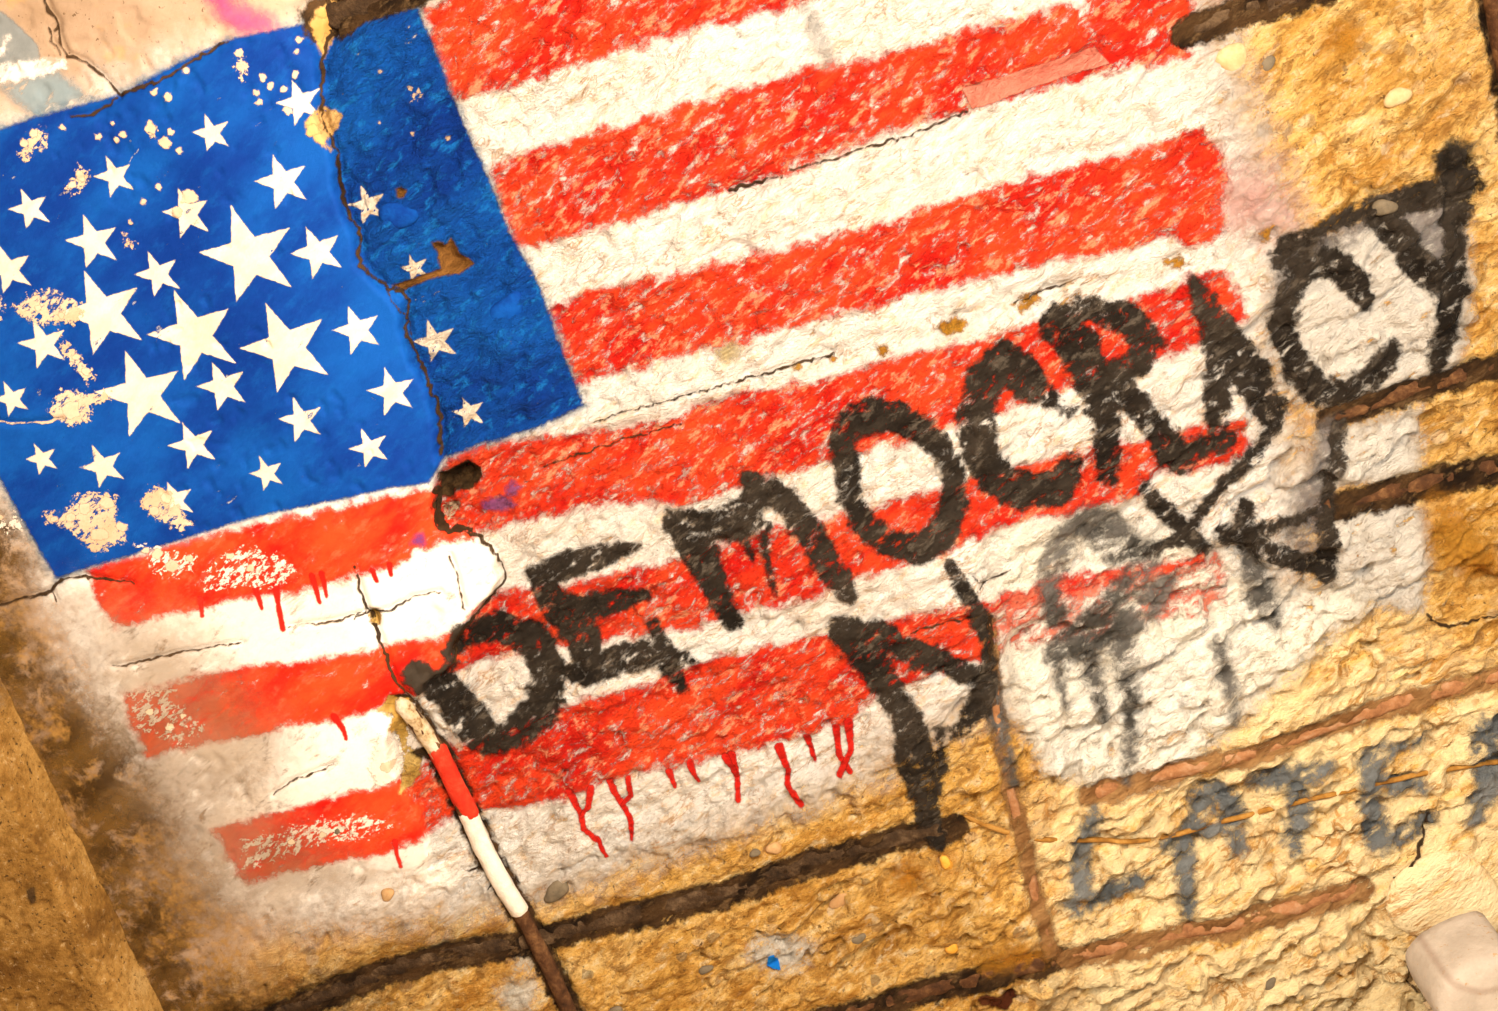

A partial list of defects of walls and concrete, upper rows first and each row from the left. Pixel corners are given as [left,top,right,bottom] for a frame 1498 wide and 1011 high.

crack [44,0,229,118]
spalling [232,0,430,151]
spalling [392,238,474,290]
peeling [0,288,112,428]
crack [288,0,507,698]
spalling [432,460,482,520]
peeling [42,485,298,591]
corrosion [1434,506,1494,570]
crack [0,574,135,606]
crack [113,642,241,667]
corrosion [978,988,1017,1010]